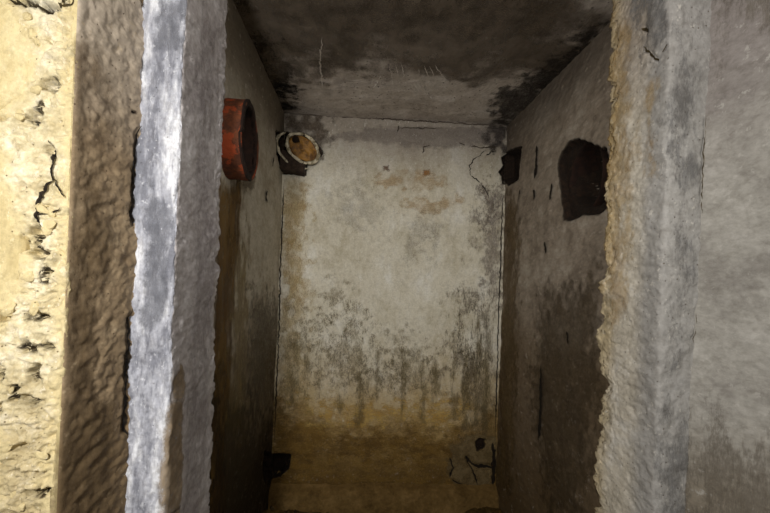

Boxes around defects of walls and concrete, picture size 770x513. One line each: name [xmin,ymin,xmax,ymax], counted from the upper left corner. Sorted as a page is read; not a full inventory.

water stain [249,0,376,110]
water stain [483,22,608,153]
crack [129,127,141,228]
spalling [0,0,79,513]
crack [121,309,133,437]
water stain [226,183,520,495]
crack [303,114,552,485]